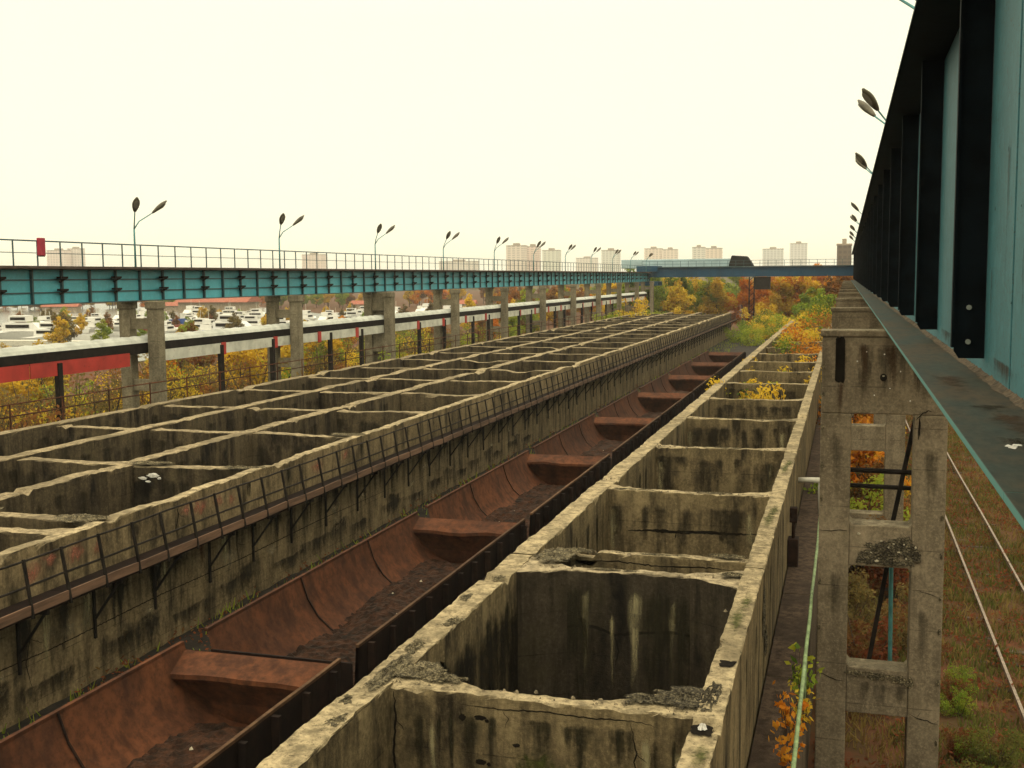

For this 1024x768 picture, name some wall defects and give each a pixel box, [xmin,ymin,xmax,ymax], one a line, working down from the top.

spalling [525,547,748,579]
crack [628,529,757,538]
spalling [856,532,921,567]
leakage [109,577,159,654]
leakage [632,595,690,688]
spalling [322,638,519,727]
spalling [592,681,722,734]